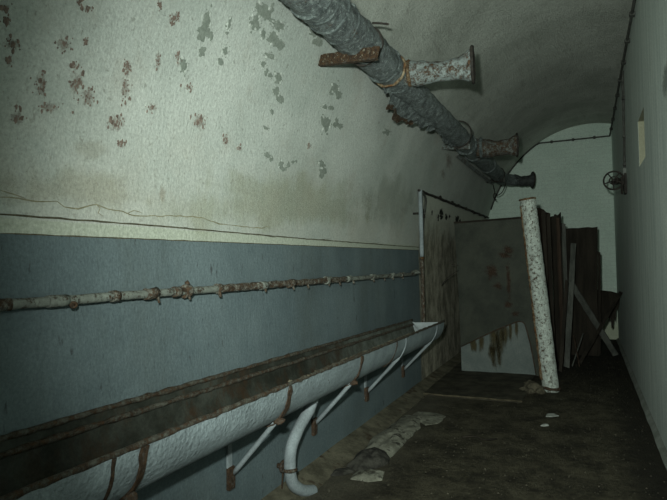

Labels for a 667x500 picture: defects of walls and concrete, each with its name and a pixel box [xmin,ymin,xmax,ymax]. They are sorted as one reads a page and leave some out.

rust [0,3,21,67]
peeling [197,4,213,57]
peeling [249,1,288,104]
rust [30,70,63,114]
rust [68,61,98,106]
rust [107,59,133,129]
peeling [320,104,343,135]
crack [0,190,418,250]